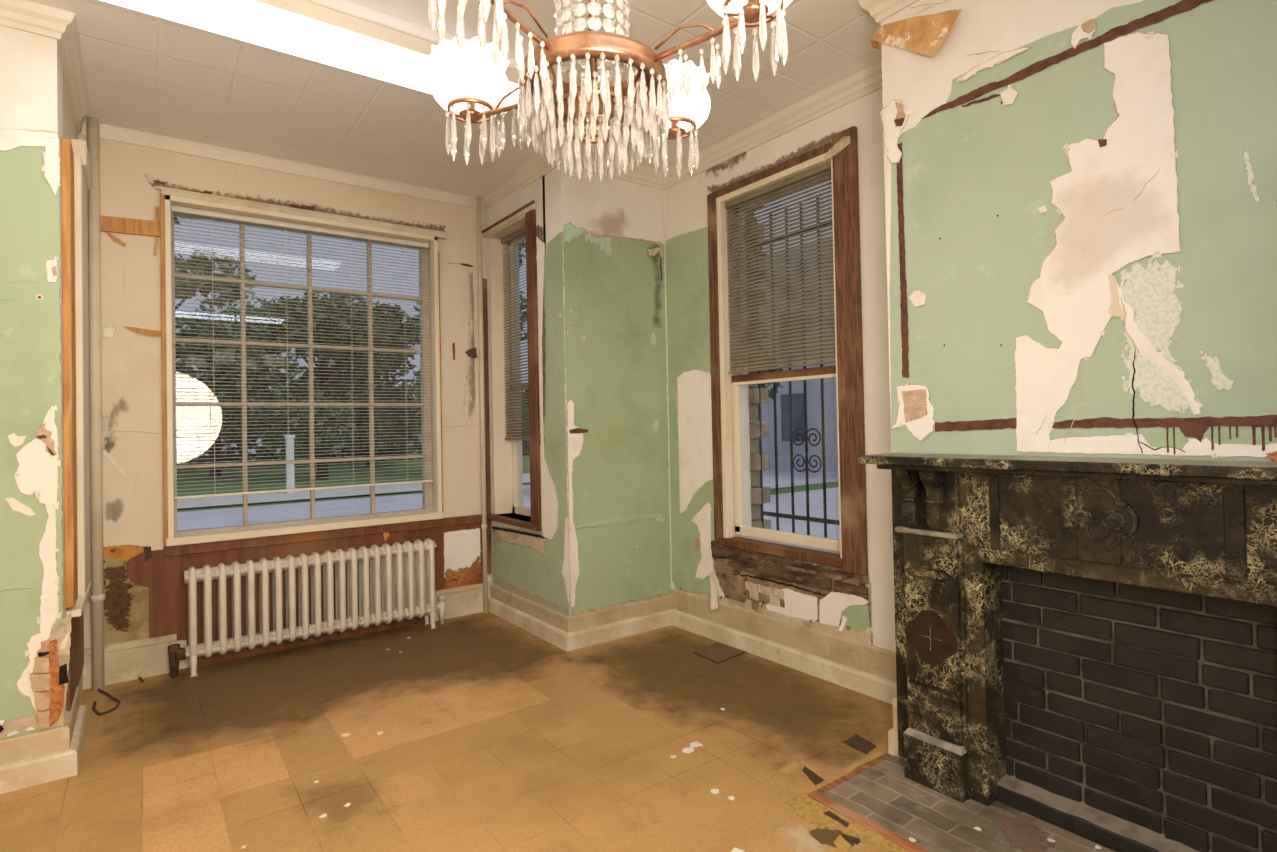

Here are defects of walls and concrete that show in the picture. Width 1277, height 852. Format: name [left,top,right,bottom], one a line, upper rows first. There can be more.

peeling [0,126,61,195]
peeling [1000,85,1018,106]
peeling [1014,19,1277,458]
peeling [476,236,588,607]
peeling [677,370,713,518]
flaking render [890,384,935,441]
peeling [0,404,72,737]
flaking render [694,538,873,636]